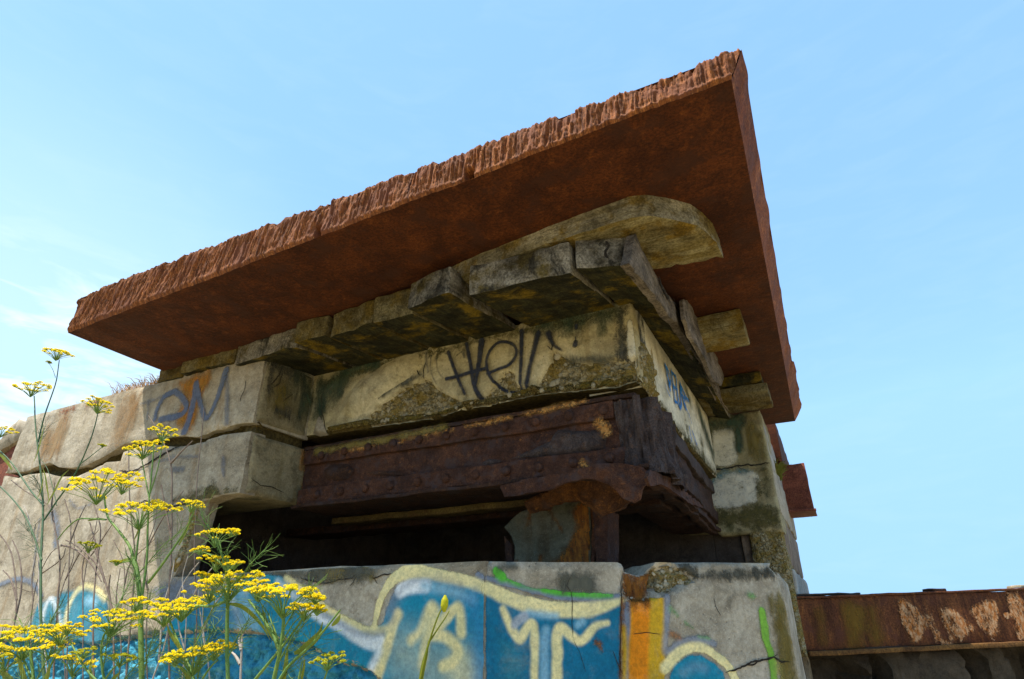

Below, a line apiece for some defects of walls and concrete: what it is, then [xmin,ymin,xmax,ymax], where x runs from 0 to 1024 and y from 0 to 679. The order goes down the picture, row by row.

rust [178,371,209,429]
damp [264,360,390,421]
spalling [327,320,660,432]
peeling [595,418,611,438]
rust [614,394,717,491]
damp [712,468,782,531]
rust [554,503,590,562]
rust [898,592,1024,645]
crack [725,654,789,673]